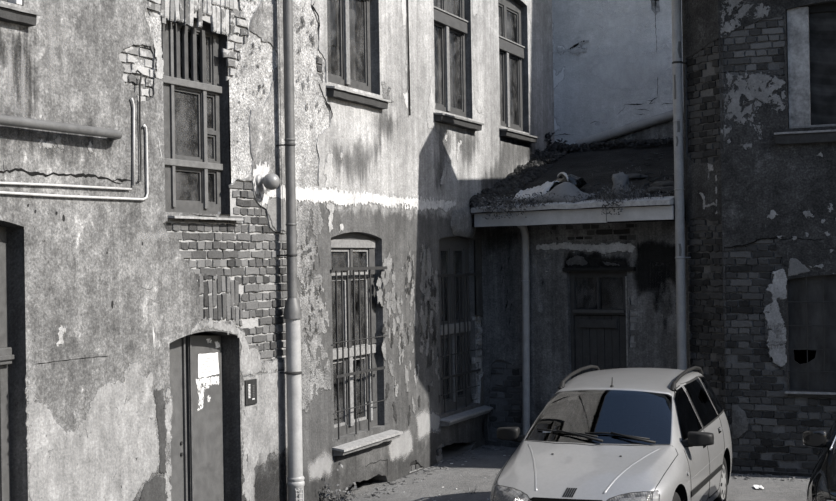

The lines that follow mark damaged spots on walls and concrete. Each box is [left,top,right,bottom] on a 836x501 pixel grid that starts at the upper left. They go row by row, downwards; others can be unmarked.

leakage [14,36,31,98]
flaking render [119,44,155,102]
flaking render [146,0,265,103]
crack [0,168,132,184]
peeling [323,152,343,188]
flaking render [674,0,836,474]
flaking render [163,161,288,501]
flaking render [296,202,344,414]
peeling [376,244,440,473]
flaking render [472,315,523,444]
peeling [309,454,333,478]